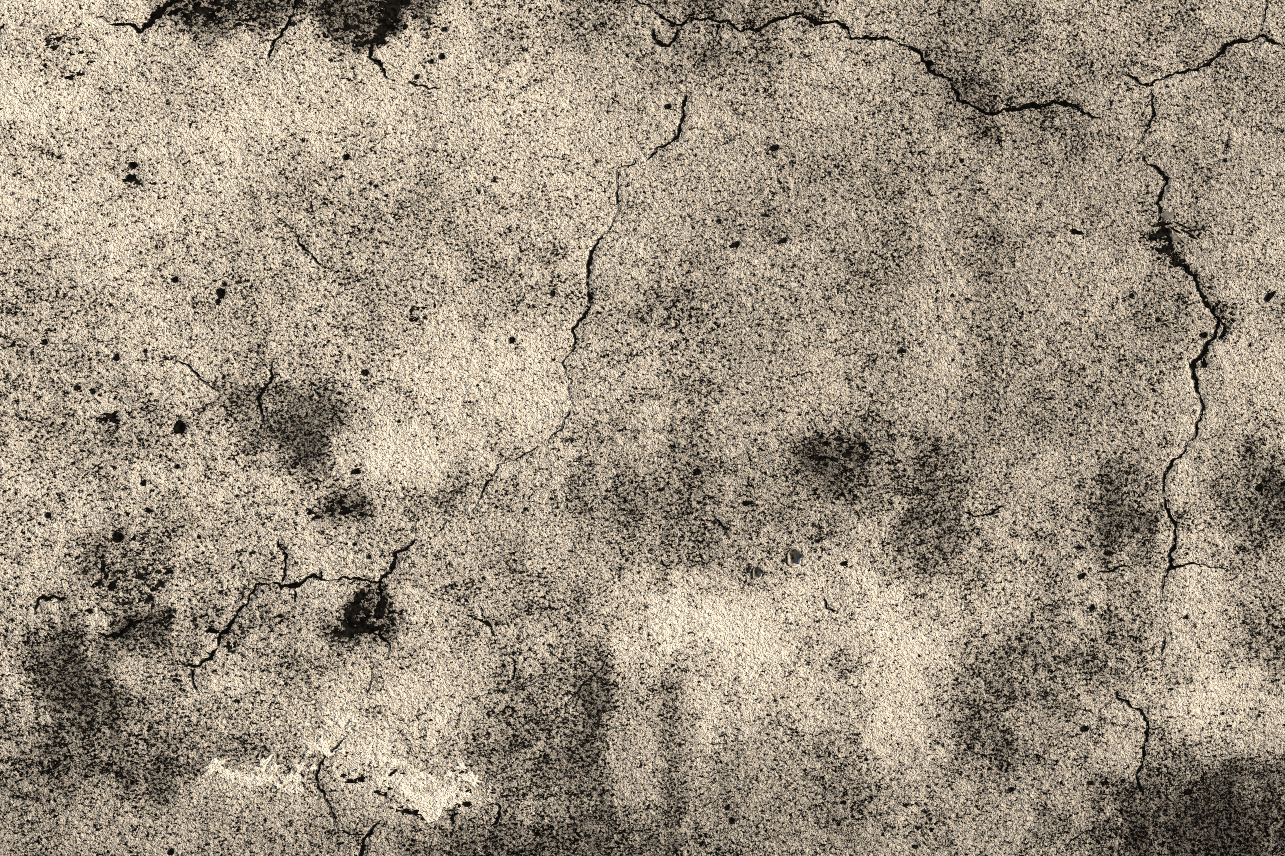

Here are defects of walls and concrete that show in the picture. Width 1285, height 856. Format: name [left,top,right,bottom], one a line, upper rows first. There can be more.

crack [368,43,440,90]
crack [637,0,1102,119]
crack [1121,0,1285,220]
crack [181,94,688,695]
crack [1098,261,1229,600]
leakage [0,575,278,828]
leakage [241,802,380,856]
peeling [202,717,493,832]
crack [315,730,383,856]
leakage [393,623,735,856]
leakage [935,403,1285,856]
crack [1071,636,1166,792]